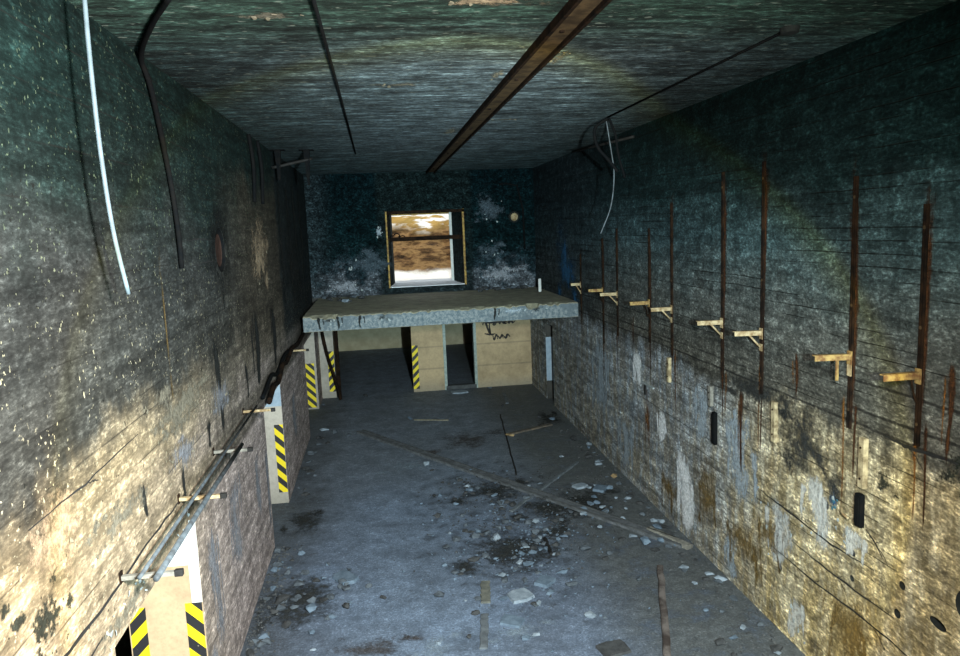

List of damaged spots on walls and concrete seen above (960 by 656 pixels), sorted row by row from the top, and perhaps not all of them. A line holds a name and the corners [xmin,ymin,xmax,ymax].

rust [841,190,859,498]
leakage [0,567,73,656]